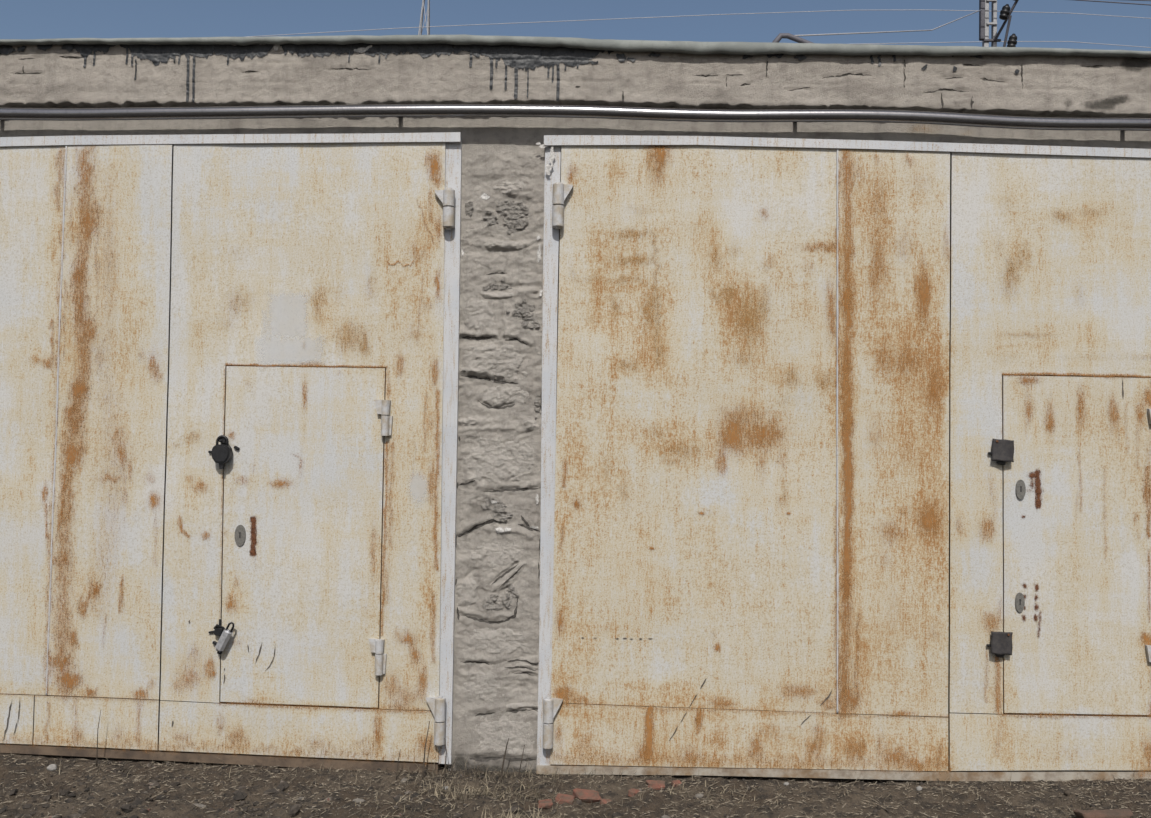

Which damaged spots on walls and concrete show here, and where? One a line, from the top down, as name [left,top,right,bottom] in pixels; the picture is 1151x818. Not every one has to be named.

corrosion [425,155,440,184]
corrosion [649,145,672,182]
corrosion [224,358,403,373]
corrosion [42,149,101,696]
corrosion [424,362,440,570]
corrosion [718,414,783,471]
corrosion [805,149,859,718]
corrosion [1022,470,1042,518]
corrosion [1003,372,1151,421]
corrosion [1023,584,1041,637]
corrosion [388,633,433,713]
corrosion [639,706,664,762]